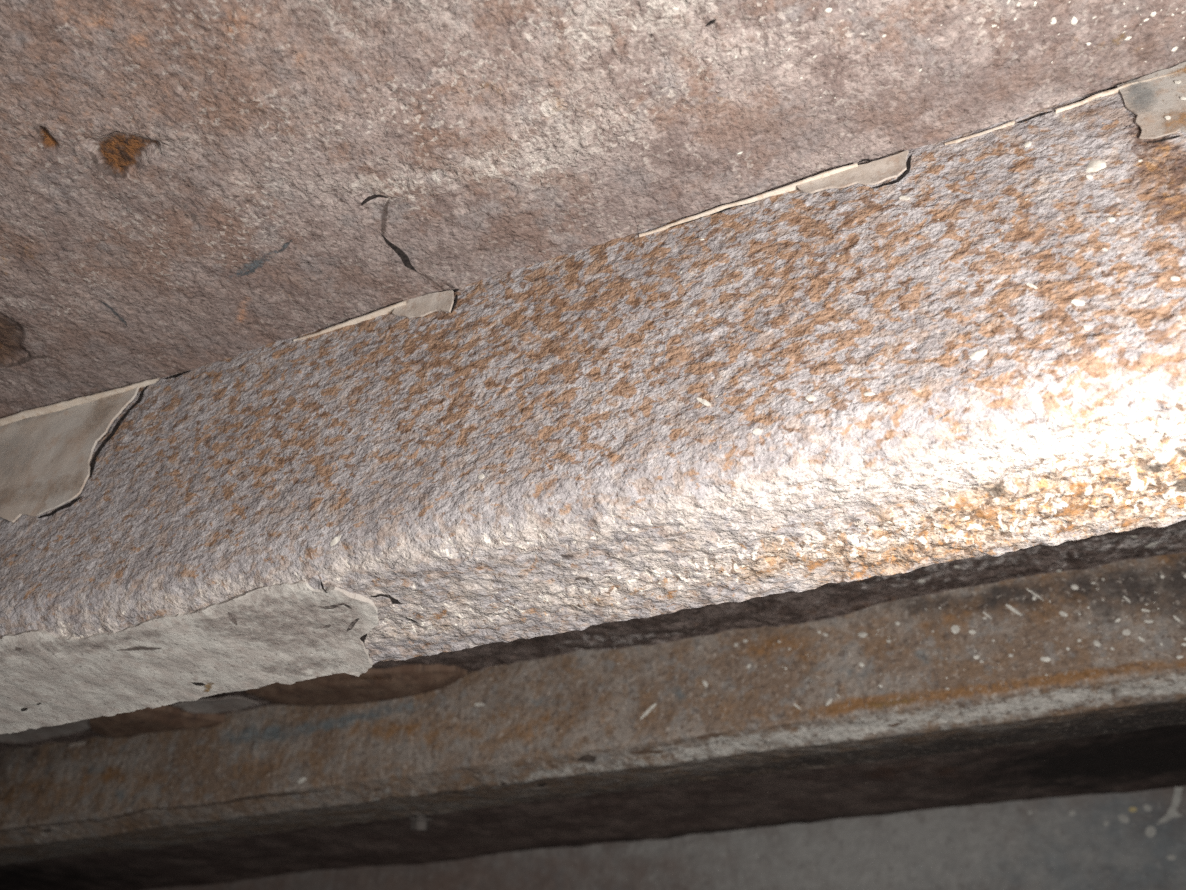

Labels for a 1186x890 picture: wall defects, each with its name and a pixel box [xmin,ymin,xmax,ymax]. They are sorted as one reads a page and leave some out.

peeling [944,69,1184,145]
peeling [639,150,912,237]
crack [361,195,445,291]
peeling [0,370,191,523]
rust [952,499,1007,519]
spalling [985,484,1006,497]
rust [1054,483,1095,533]
spalling [1173,479,1186,492]
peeling [172,682,258,714]
rust [246,664,468,706]
peeling [0,719,91,747]